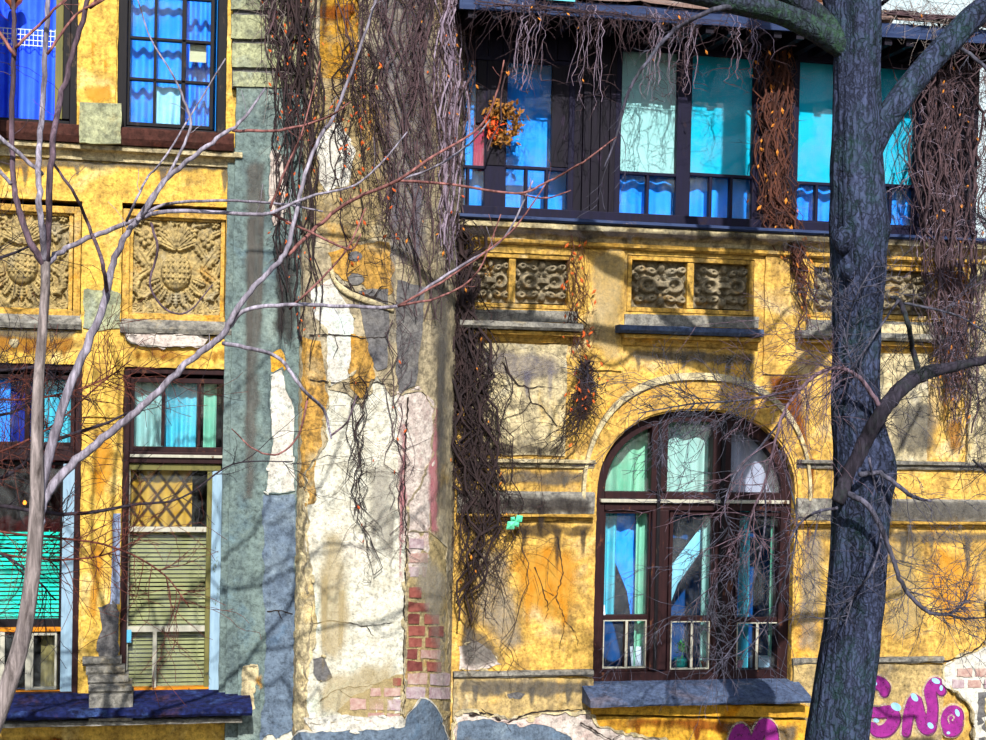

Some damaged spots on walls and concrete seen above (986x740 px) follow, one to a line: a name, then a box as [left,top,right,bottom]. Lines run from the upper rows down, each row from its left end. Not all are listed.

flaking render [260,278,668,740]
crack [491,362,558,425]
leakage [461,351,814,664]
flaking render [941,640,986,740]